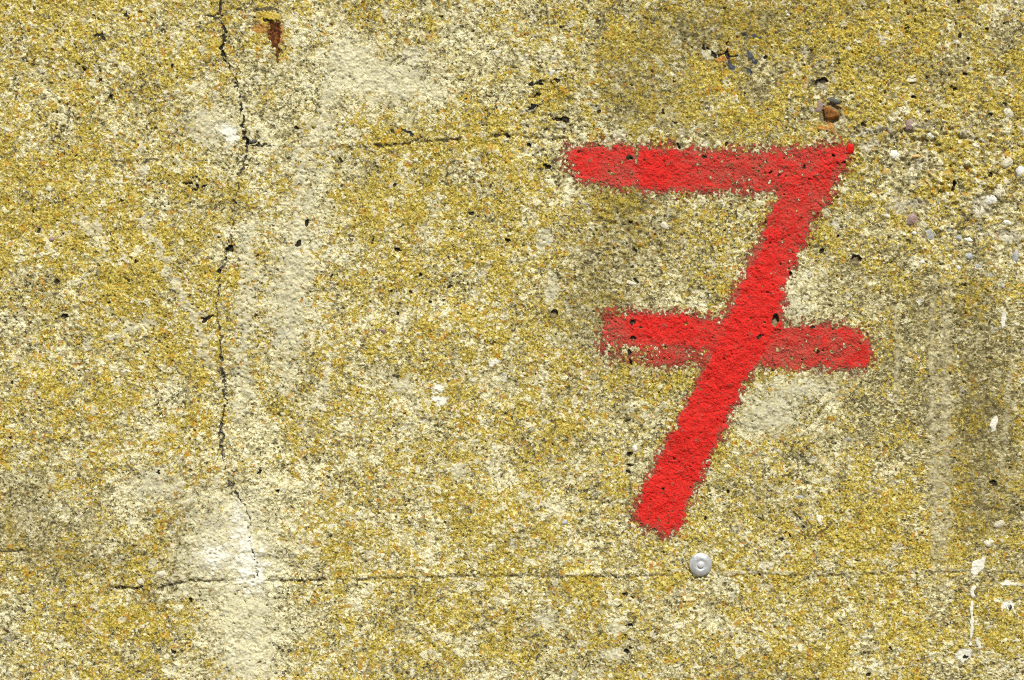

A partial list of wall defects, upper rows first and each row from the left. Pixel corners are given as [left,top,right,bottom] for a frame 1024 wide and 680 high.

rust [252,20,284,63]
crack [375,128,461,147]
crack [198,0,274,578]